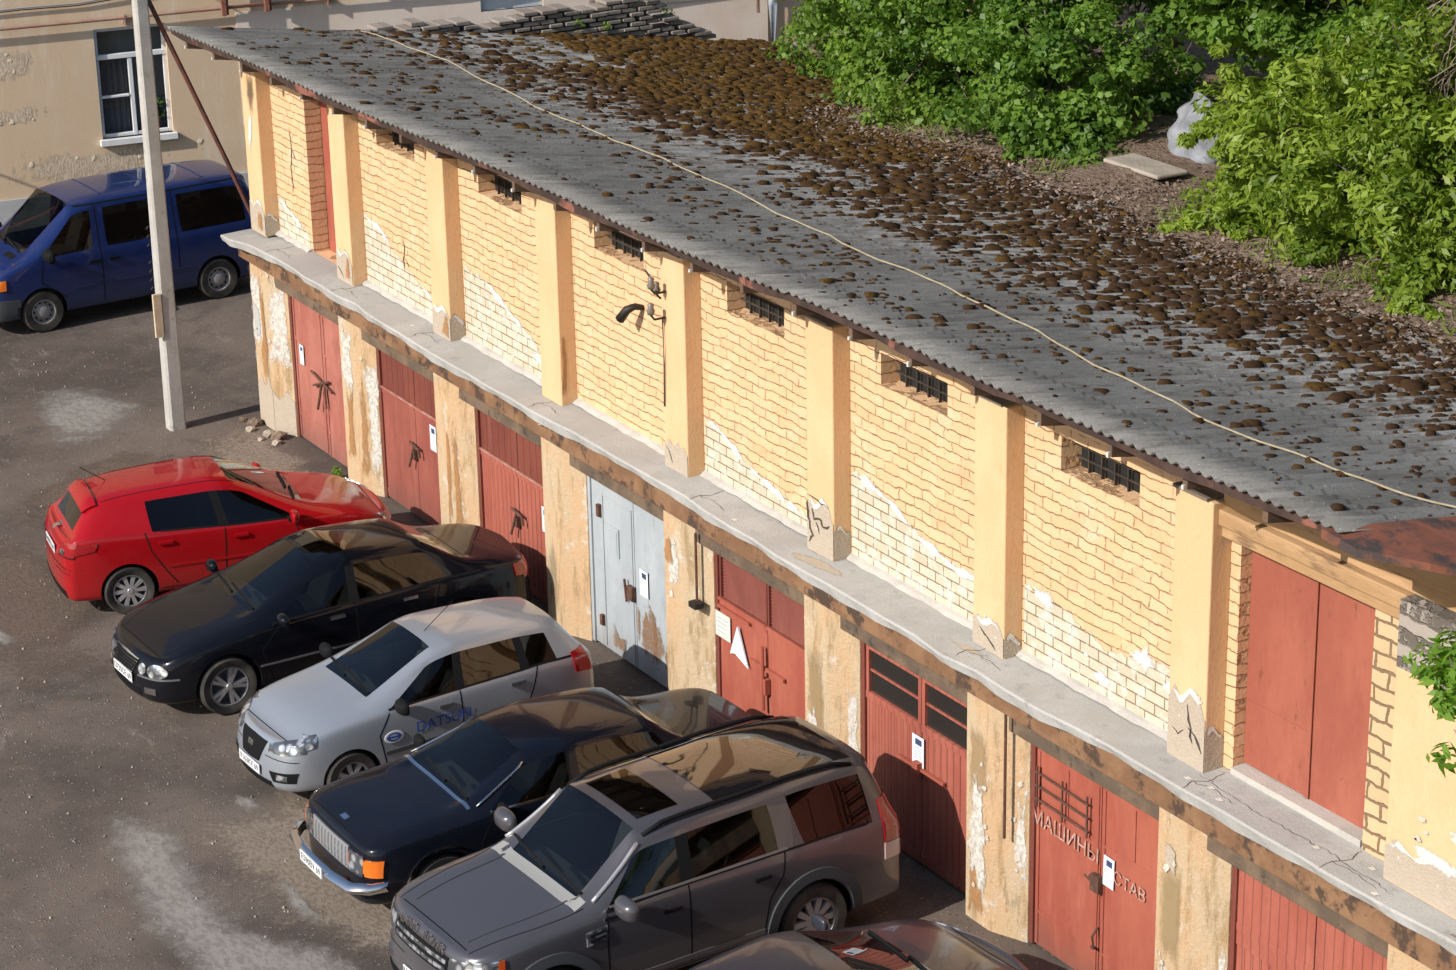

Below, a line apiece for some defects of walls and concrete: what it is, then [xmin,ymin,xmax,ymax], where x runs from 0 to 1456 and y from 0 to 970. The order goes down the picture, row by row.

spalling [665,439,688,478]
spalling [668,538,679,598]
flaking render [704,413,1224,773]
corrosion [613,606,668,671]